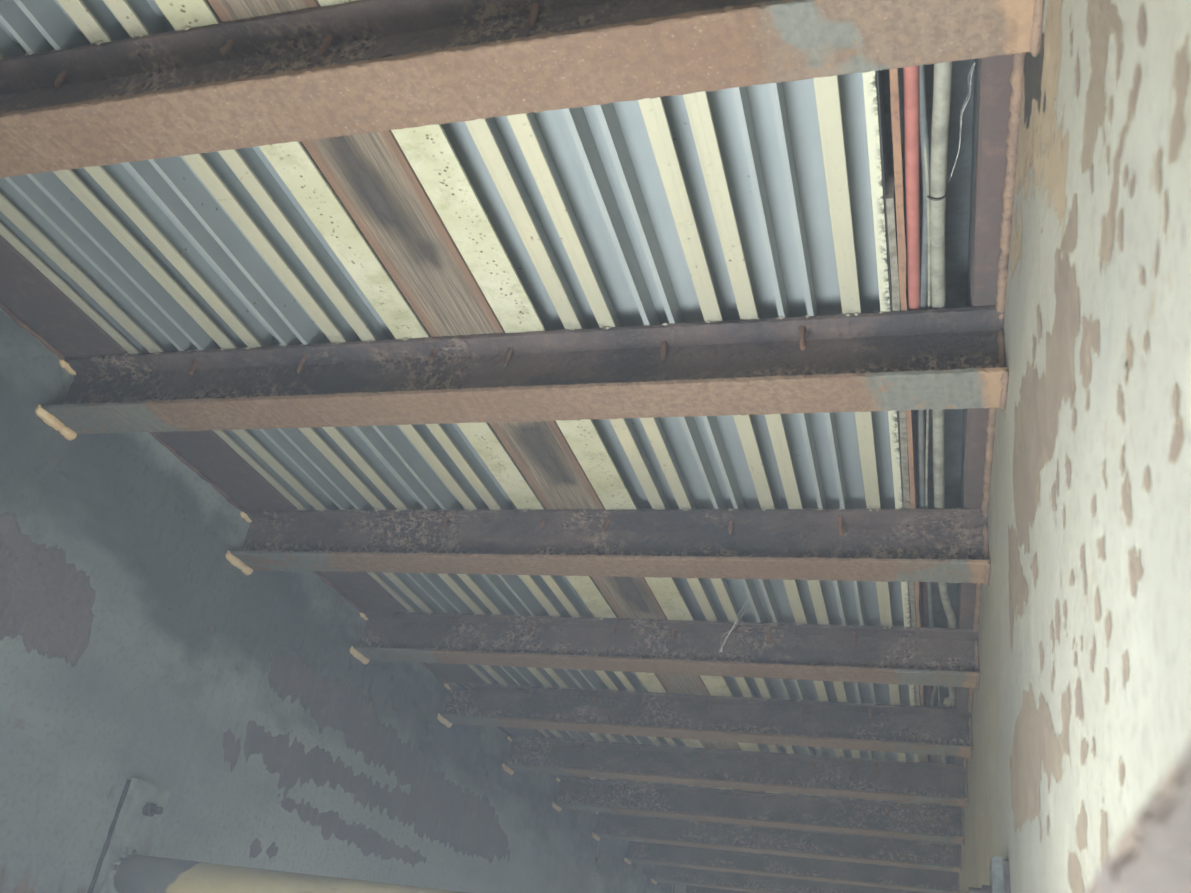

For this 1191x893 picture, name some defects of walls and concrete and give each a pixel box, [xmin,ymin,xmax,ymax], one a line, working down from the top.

peeling [1023,33,1046,128]
peeling [1081,0,1141,273]
peeling [1169,36,1189,164]
peeling [1008,195,1100,649]
peeling [1168,418,1184,463]
peeling [1010,677,1083,832]
peeling [1067,800,1109,893]